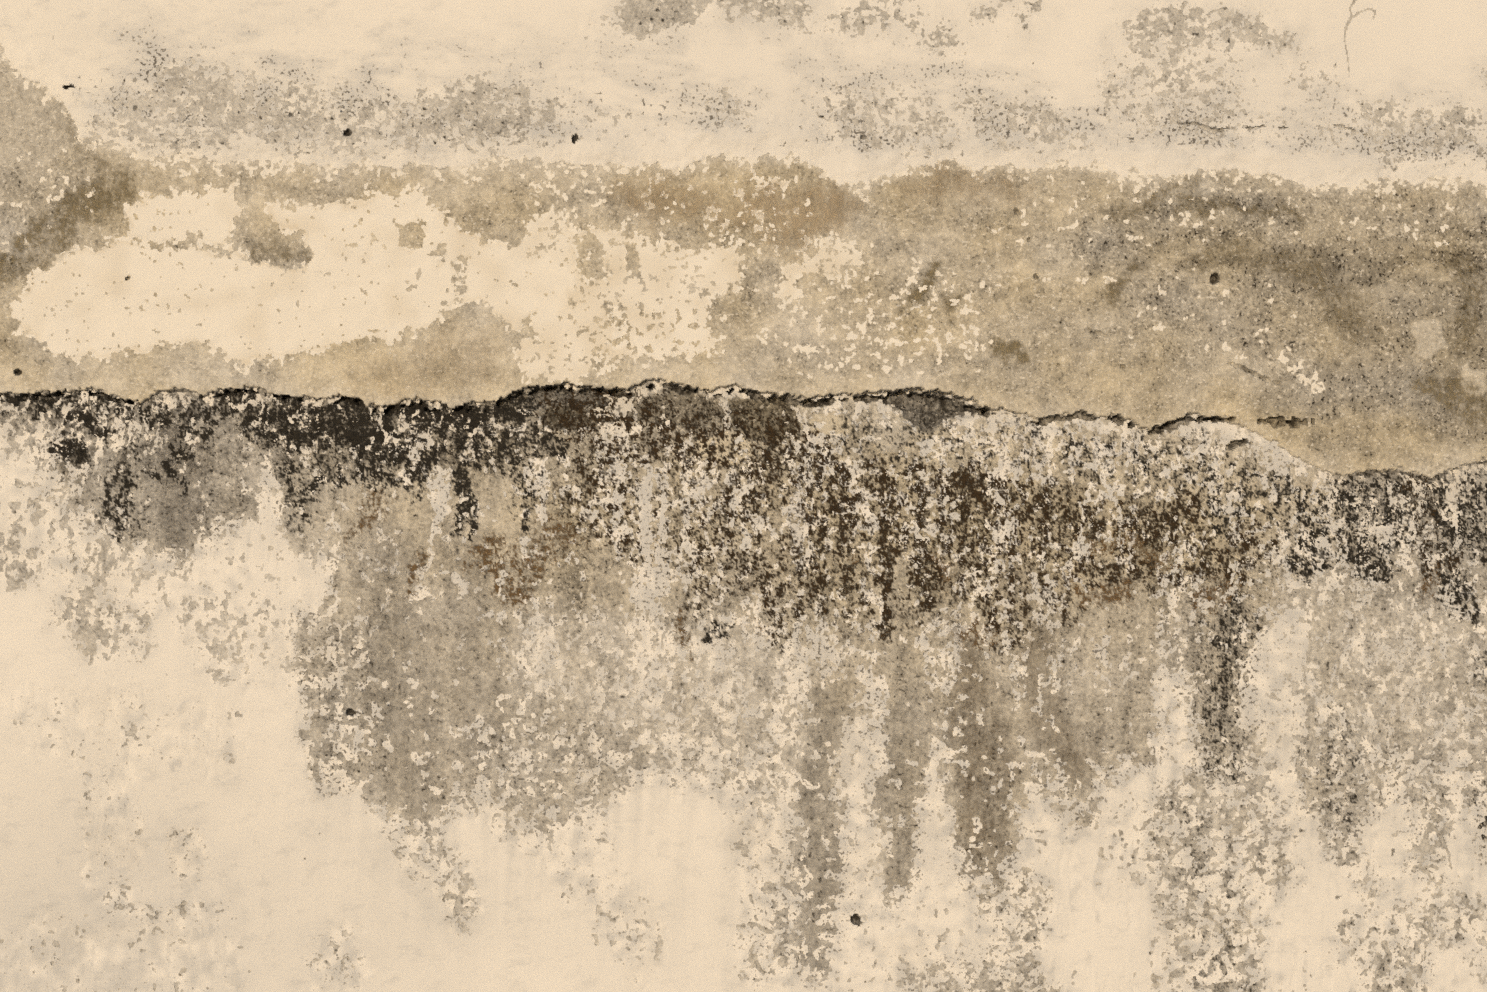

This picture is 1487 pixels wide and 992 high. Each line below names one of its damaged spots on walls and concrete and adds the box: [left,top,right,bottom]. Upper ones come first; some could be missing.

peeling [0,50,632,213]
damp [739,184,844,240]
peeling [793,81,1117,285]
crack [18,382,996,418]
peeling [756,229,993,378]
crack [1084,327,1109,338]
crack [1030,362,1315,450]
peeling [1137,268,1247,360]
peeling [1277,346,1325,394]
crack [1347,461,1487,484]
damp [0,385,1487,784]
damp [1322,705,1358,830]